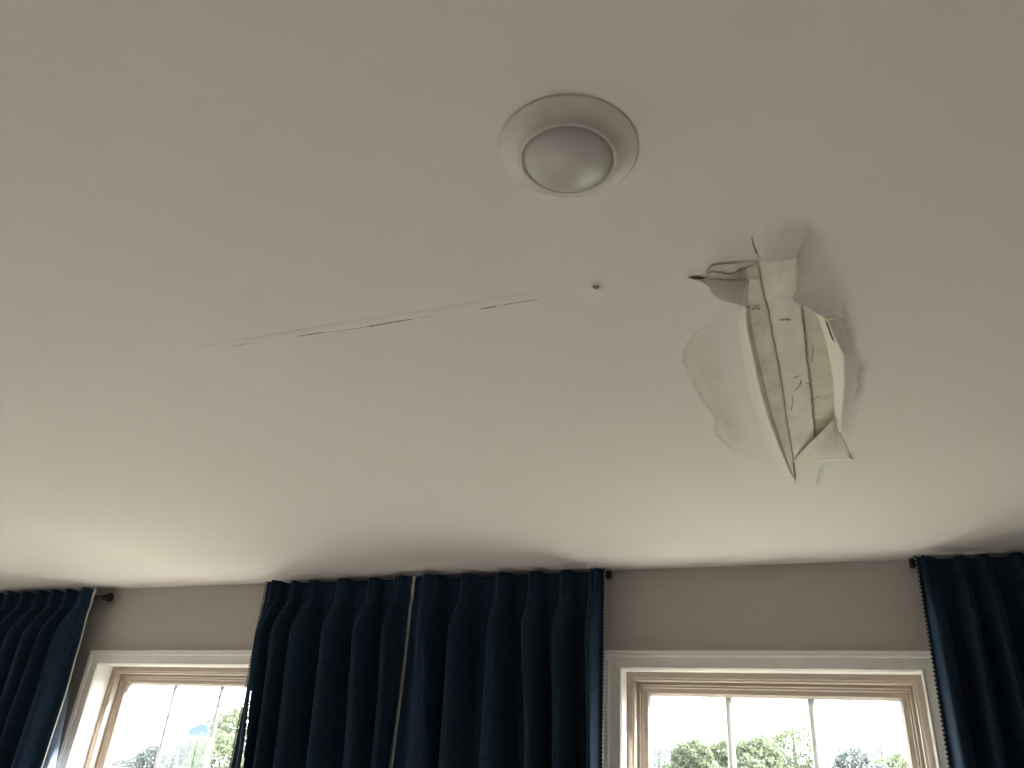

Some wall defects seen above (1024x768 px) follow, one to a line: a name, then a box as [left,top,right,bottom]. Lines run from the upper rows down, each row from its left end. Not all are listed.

peeling [688,216,865,484]